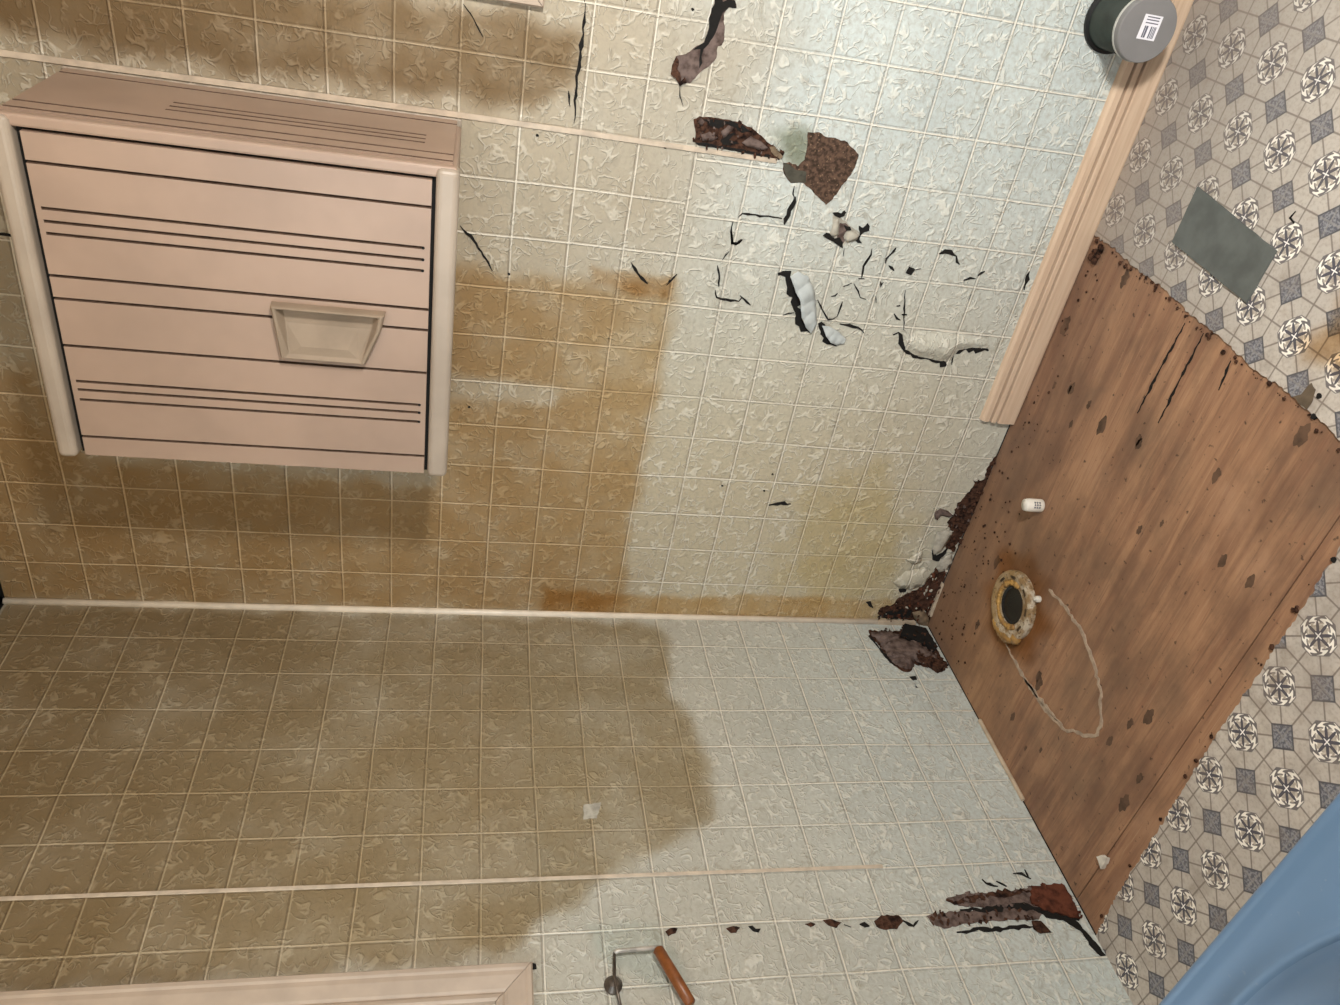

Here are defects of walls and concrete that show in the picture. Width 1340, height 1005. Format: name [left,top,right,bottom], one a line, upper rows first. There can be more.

crack [568,0,586,122]
spalling [671,57,687,86]
spalling [693,116,870,256]
peeling [778,271,846,346]
peeling [893,530,953,593]
spalling [866,601,937,652]
spalling [805,919,851,928]
spalling [874,915,919,930]
peeling [1031,920,1051,934]